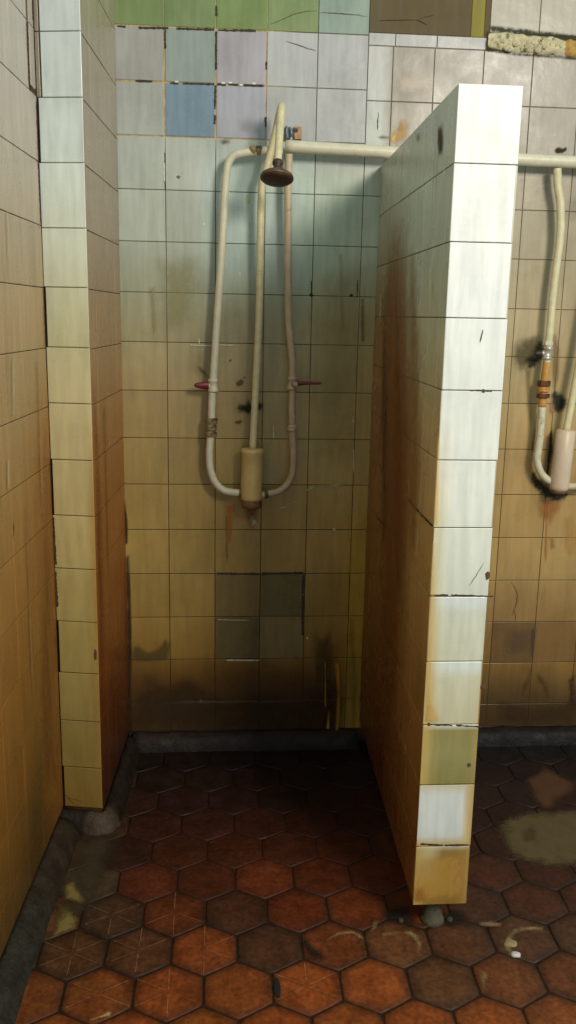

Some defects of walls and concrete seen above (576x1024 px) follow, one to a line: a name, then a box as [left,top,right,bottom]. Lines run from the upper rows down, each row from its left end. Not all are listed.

spalling [486,26,576,59]
leakage [517,338,543,385]
leakage [235,401,262,424]
leakage [551,392,566,413]